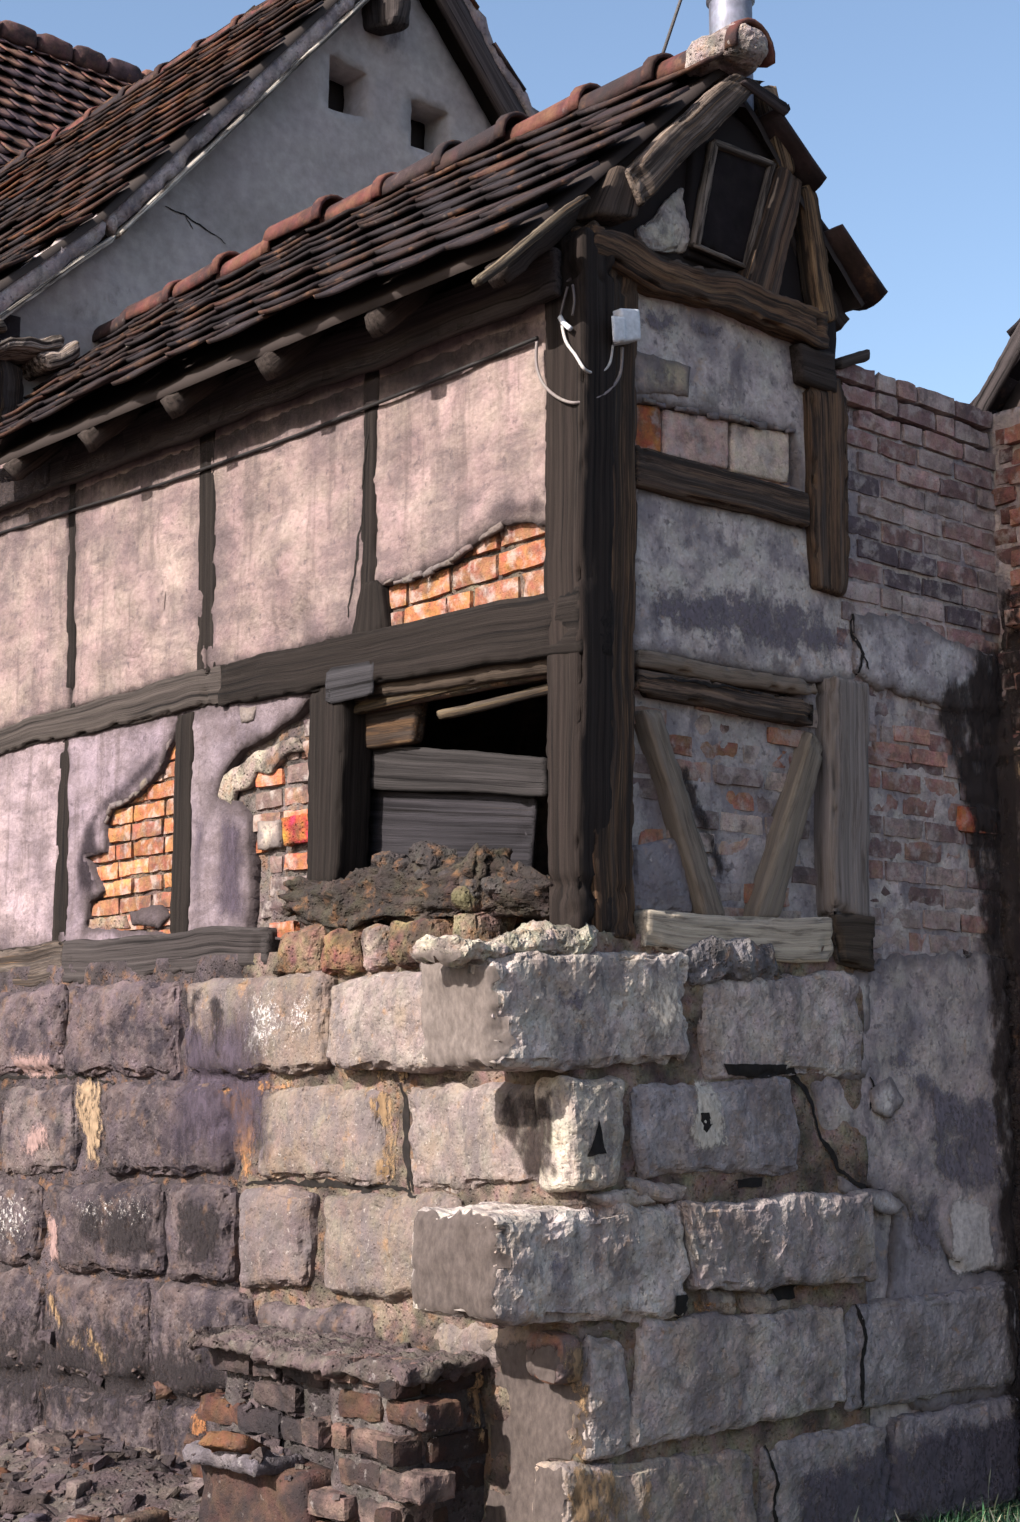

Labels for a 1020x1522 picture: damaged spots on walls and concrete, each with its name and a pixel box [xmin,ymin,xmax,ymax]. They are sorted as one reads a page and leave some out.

crack [165,206,226,244]
flaking render [635,351,796,488]
flaking render [383,522,546,626]
flaking render [239,706,256,723]
flaking render [375,675,547,712]
flaking render [88,739,176,934]
flaking render [218,712,310,938]
crack [744,1068,881,1190]